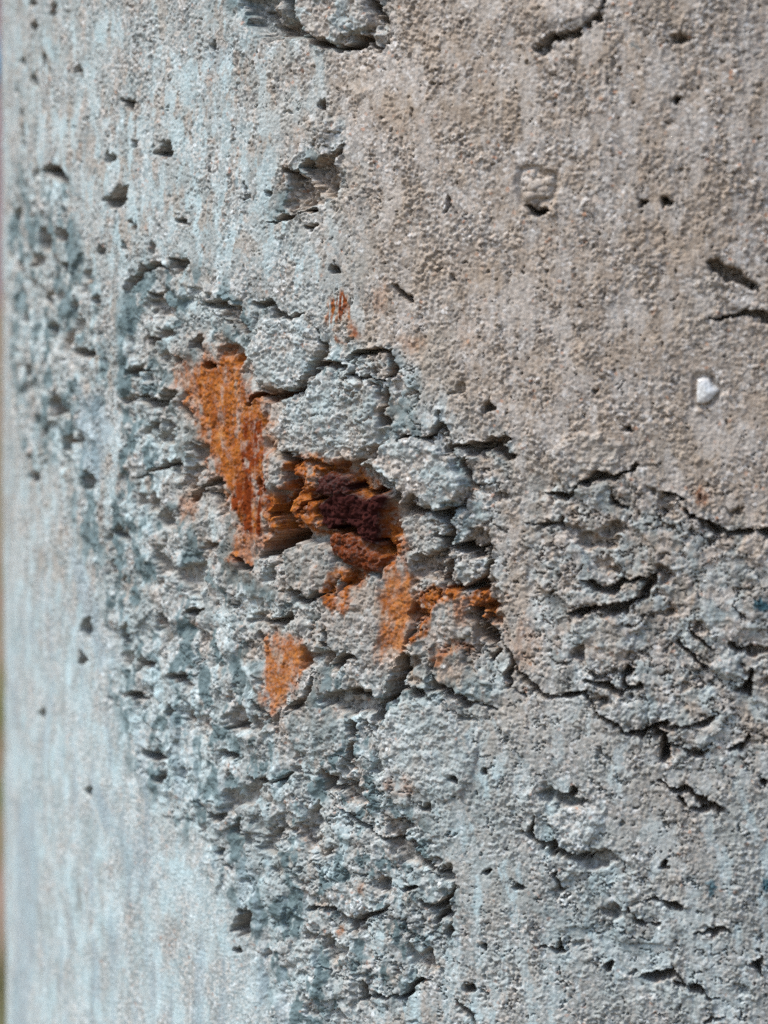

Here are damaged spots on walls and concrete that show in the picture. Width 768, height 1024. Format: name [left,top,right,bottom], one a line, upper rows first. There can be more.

spalling [5,150,114,598]
rust [248,616,322,733]
rust [154,318,548,676]
spalling [99,251,768,1024]
crack [202,297,768,943]
crack [537,937,570,961]
crack [639,966,724,1024]
crack [748,948,768,978]